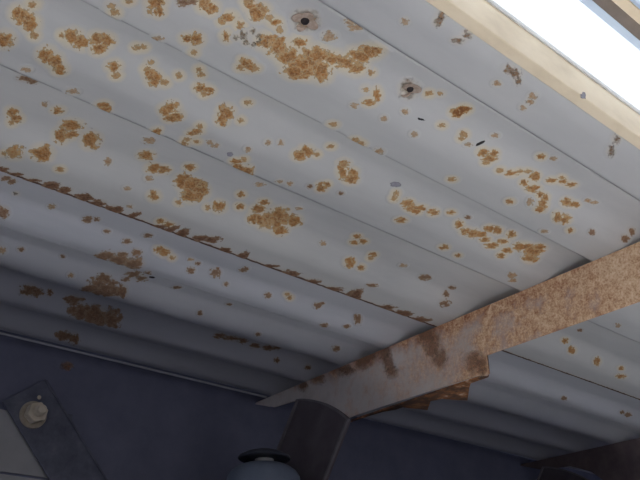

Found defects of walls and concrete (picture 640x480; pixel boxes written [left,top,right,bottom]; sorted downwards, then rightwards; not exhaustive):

corrosion [0,0,602,330]
corrosion [502,349,640,400]